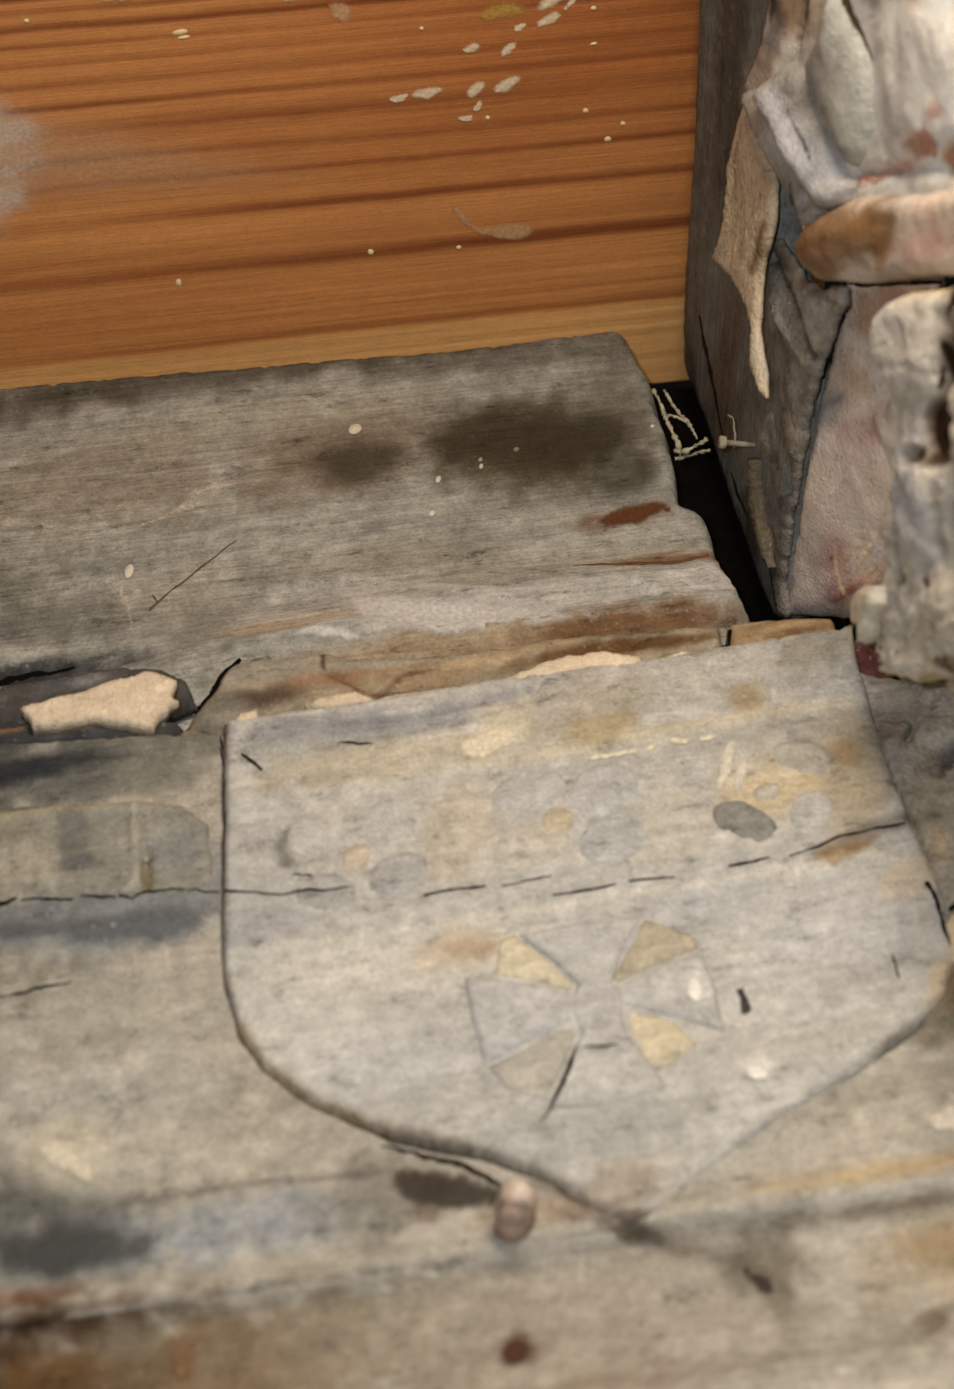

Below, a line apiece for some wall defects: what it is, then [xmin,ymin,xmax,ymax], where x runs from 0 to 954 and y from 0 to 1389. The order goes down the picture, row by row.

rust [601,502,670,525]
peeling [20,671,180,737]
crack [0,981,72,997]